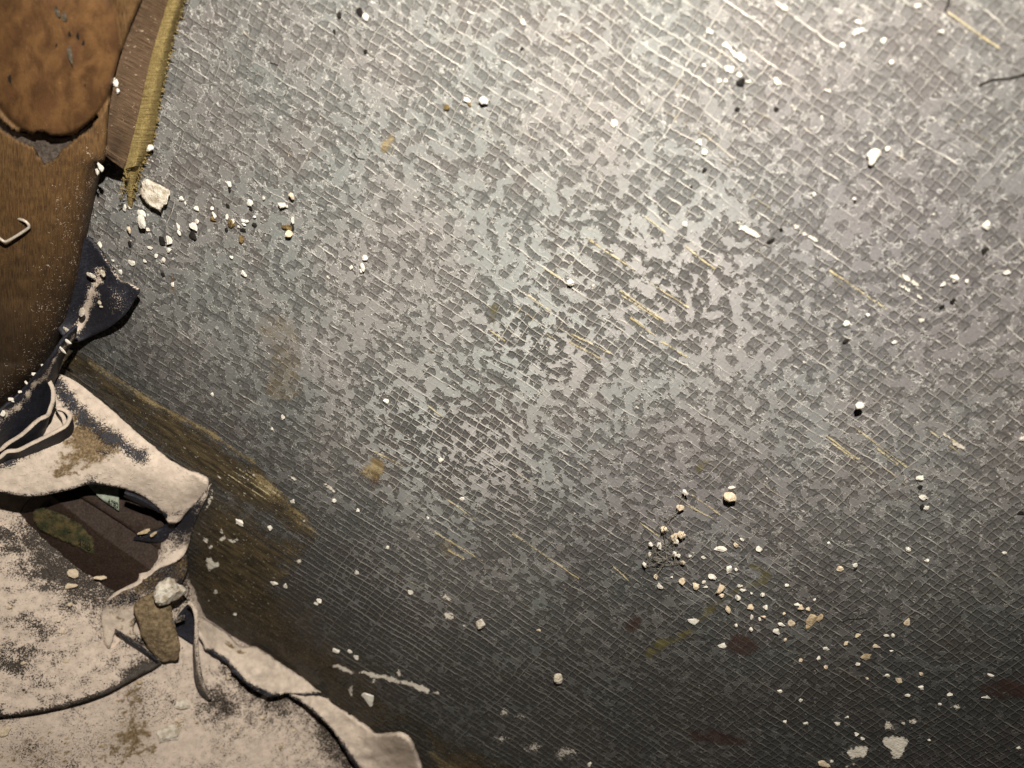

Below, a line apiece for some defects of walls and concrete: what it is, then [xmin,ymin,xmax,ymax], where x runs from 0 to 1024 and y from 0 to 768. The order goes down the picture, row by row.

peeling [199,529,238,571]
damp [63,352,380,711]
peeling [333,665,439,696]